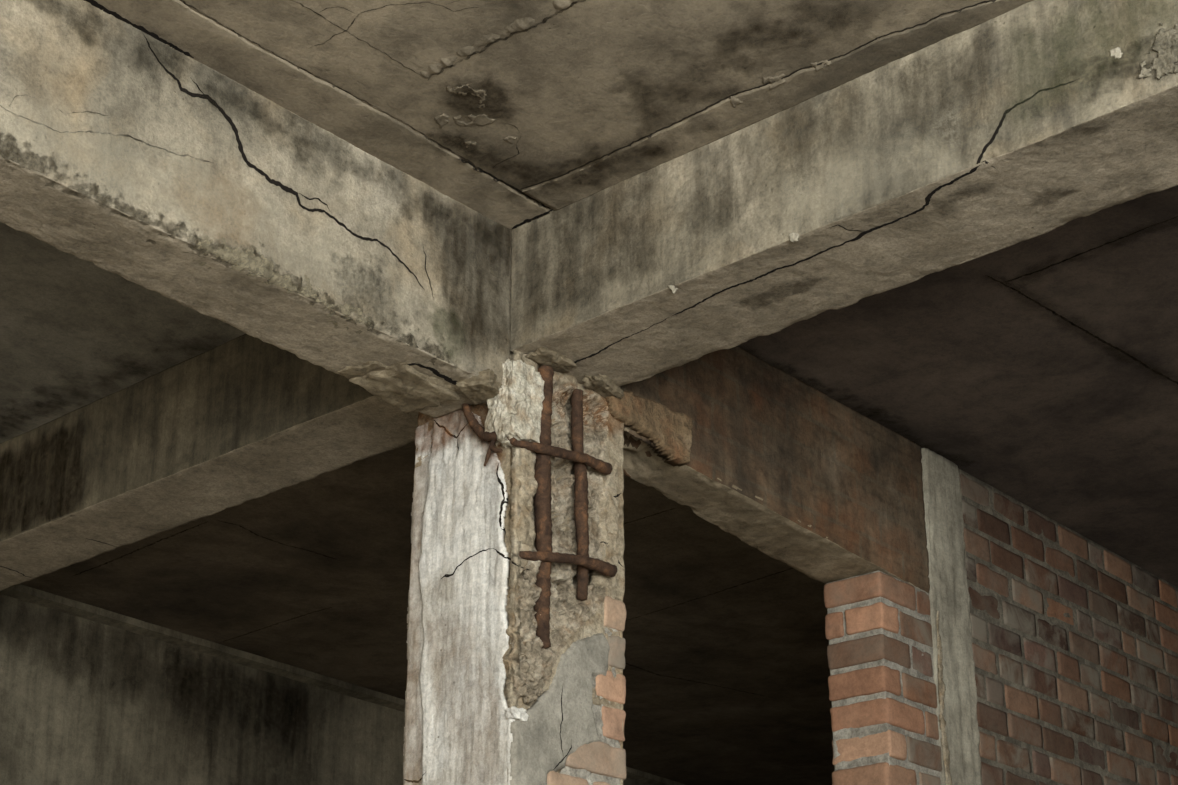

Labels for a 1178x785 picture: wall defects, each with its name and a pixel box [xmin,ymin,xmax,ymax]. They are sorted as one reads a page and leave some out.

crack [0,96,214,163]
crack [142,32,434,299]
leakage [448,80,507,116]
crack [574,80,1076,363]
flaking render [1138,23,1178,79]
crack [441,463,532,579]
spalling [502,347,626,785]